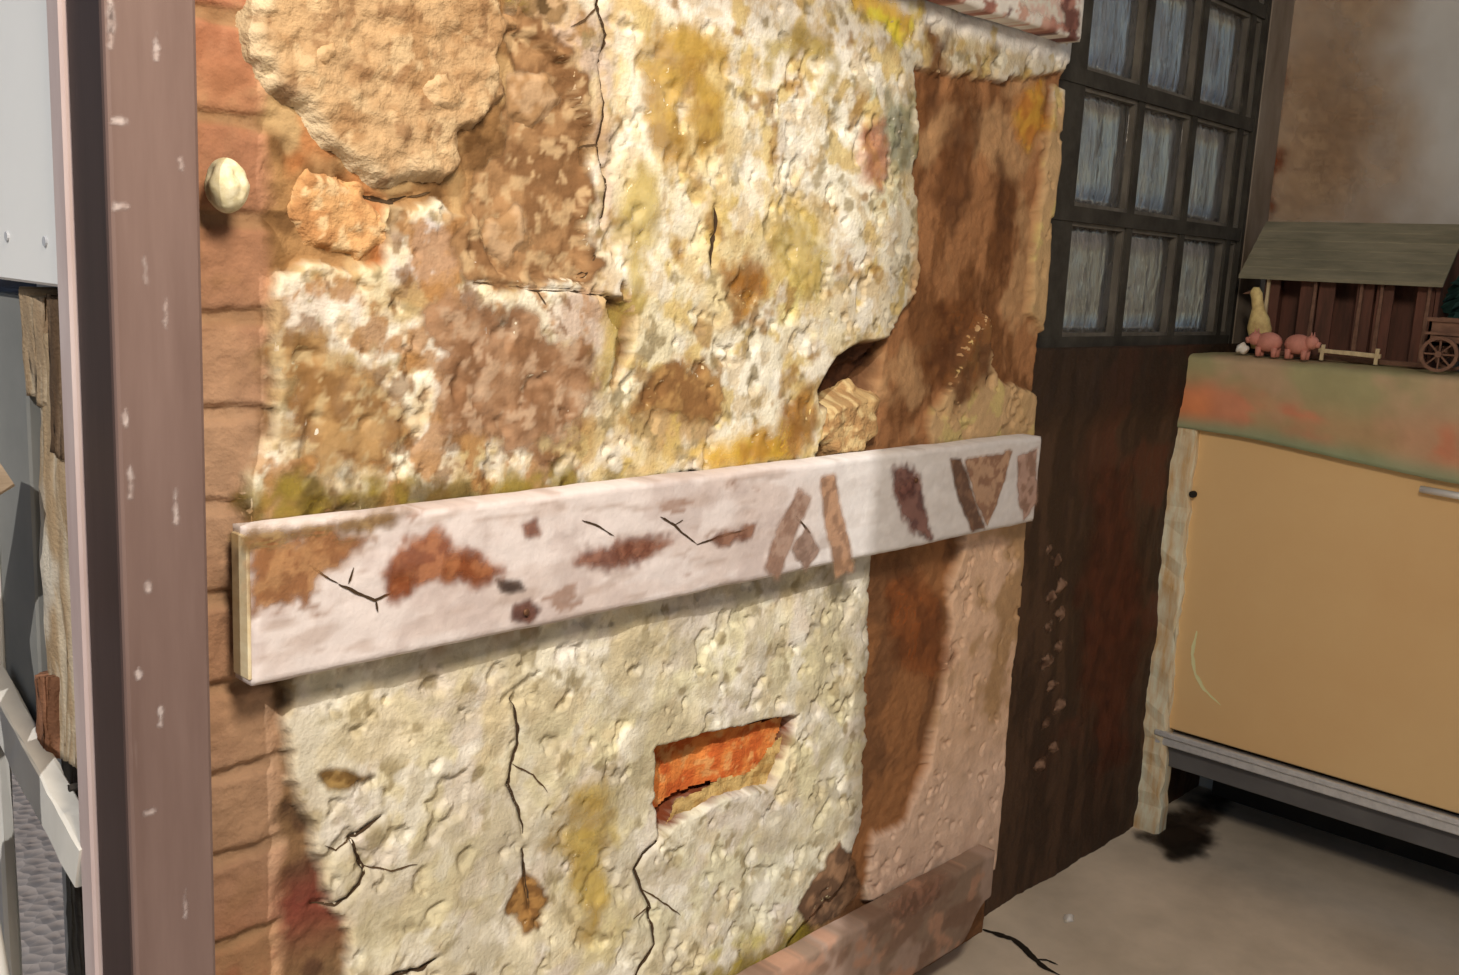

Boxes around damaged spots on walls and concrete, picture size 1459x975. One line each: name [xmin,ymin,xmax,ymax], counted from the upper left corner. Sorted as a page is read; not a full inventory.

crack [571,0,607,218]
water stain [852,0,945,110]
water stain [1273,0,1367,216]
flaking render [287,168,386,261]
spalling [422,0,606,465]
water stain [992,162,1017,276]
spalling [817,341,880,456]
water stain [923,301,993,404]
crack [506,697,547,906]
spalling [652,717,783,826]
crack [311,816,417,907]
crack [633,840,679,975]